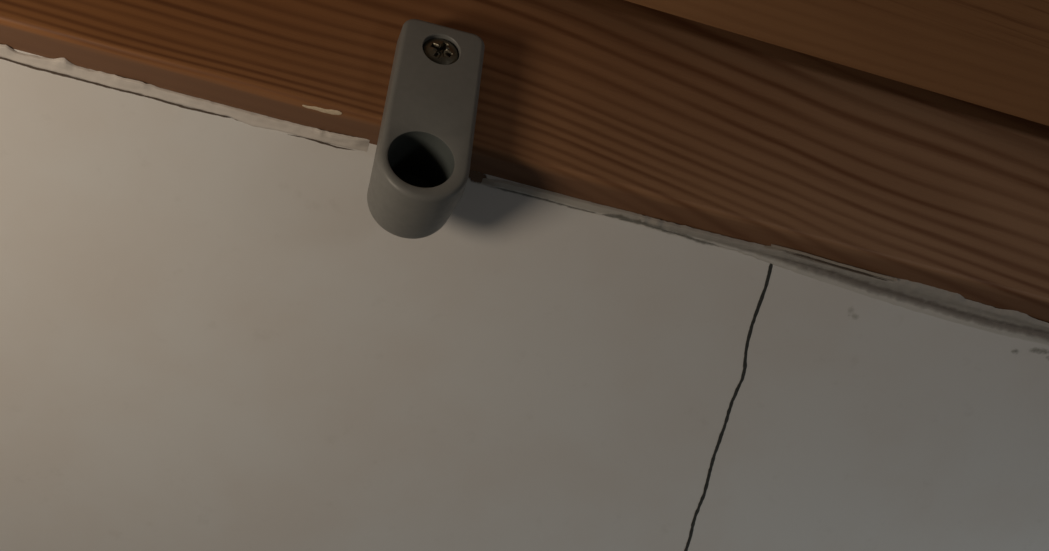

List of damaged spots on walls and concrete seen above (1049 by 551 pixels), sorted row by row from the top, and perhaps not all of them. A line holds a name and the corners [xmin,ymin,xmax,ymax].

crack [684,263,773,551]